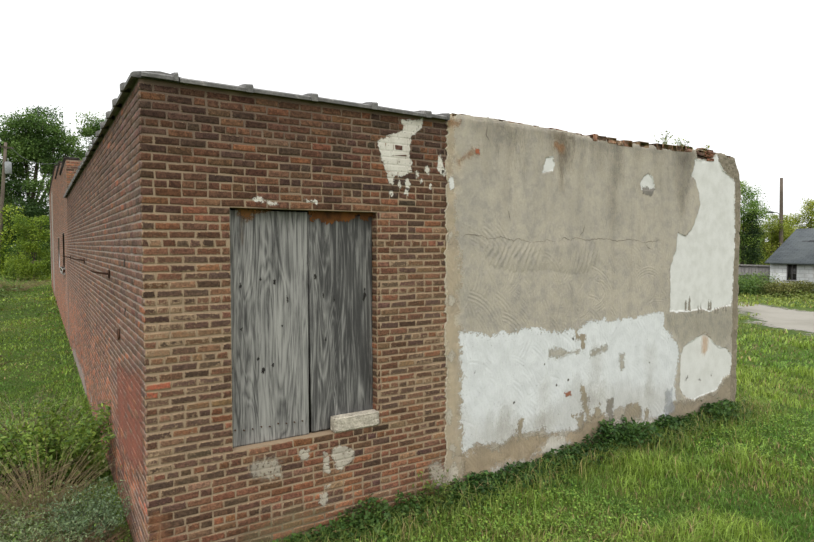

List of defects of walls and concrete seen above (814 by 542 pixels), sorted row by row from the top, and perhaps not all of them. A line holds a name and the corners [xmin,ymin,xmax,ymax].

peeling [378,118,455,197]
crack [464,226,658,249]
peeling [446,148,741,485]